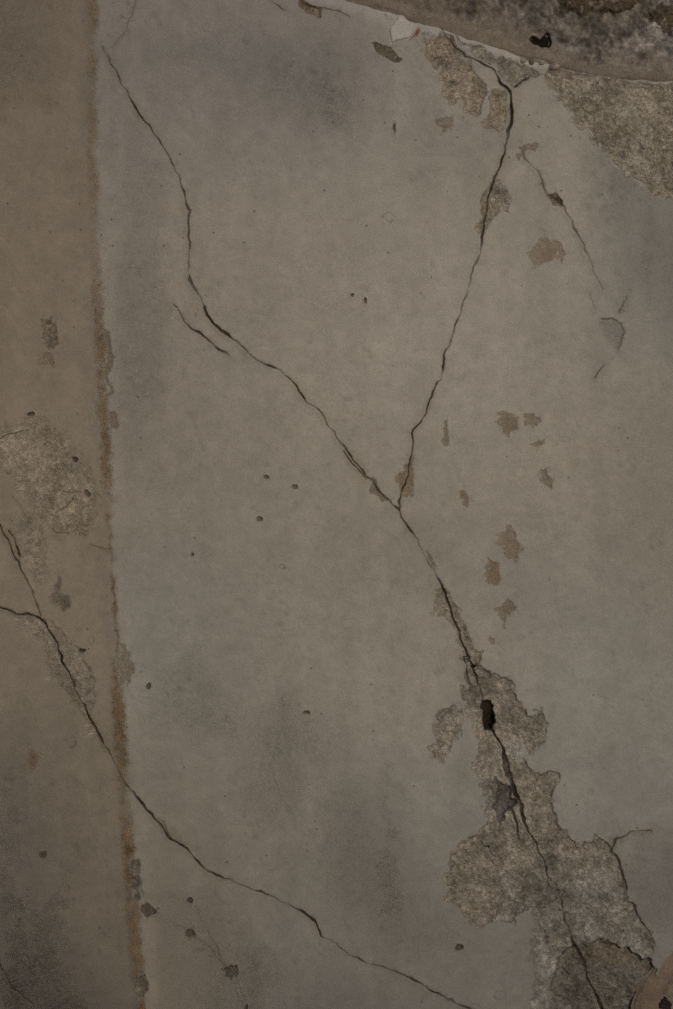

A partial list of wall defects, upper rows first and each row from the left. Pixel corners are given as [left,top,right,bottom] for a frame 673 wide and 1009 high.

crack [451,41,528,244]
peeling [475,171,510,233]
spalling [373,16,673,200]
spalling [547,192,563,206]
crack [173,304,232,352]
crack [345,350,446,533]
peeling [497,411,540,436]
peeling [485,525,521,585]
crack [0,603,111,754]
crack [438,578,478,684]
crack [489,714,549,878]
spalling [427,587,657,1009]